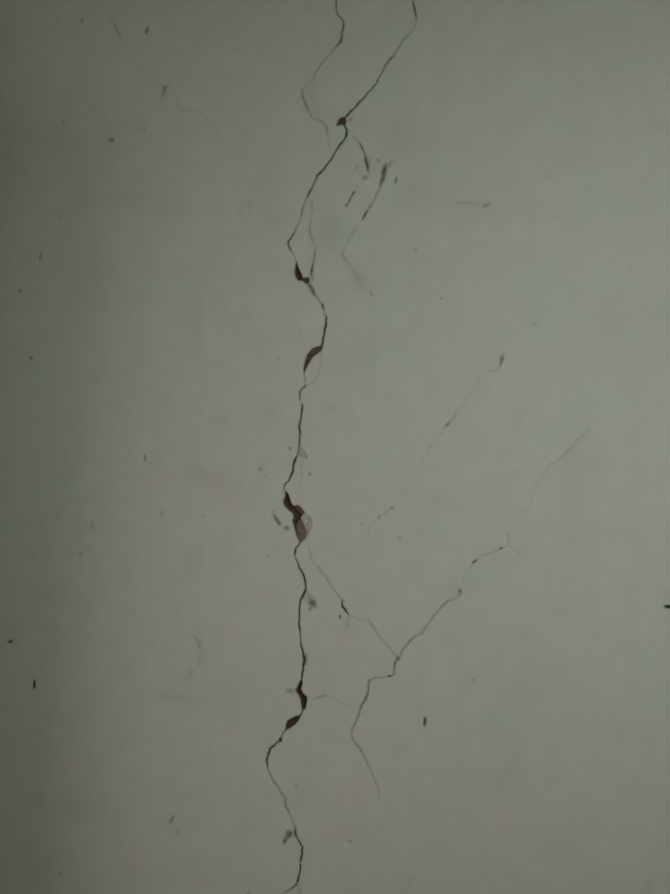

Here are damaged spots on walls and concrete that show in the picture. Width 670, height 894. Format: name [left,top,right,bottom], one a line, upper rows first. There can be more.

crack [308,54,395,195]
crack [310,256,327,347]
crack [284,385,306,487]
crack [294,543,306,677]
crack [291,829,303,889]